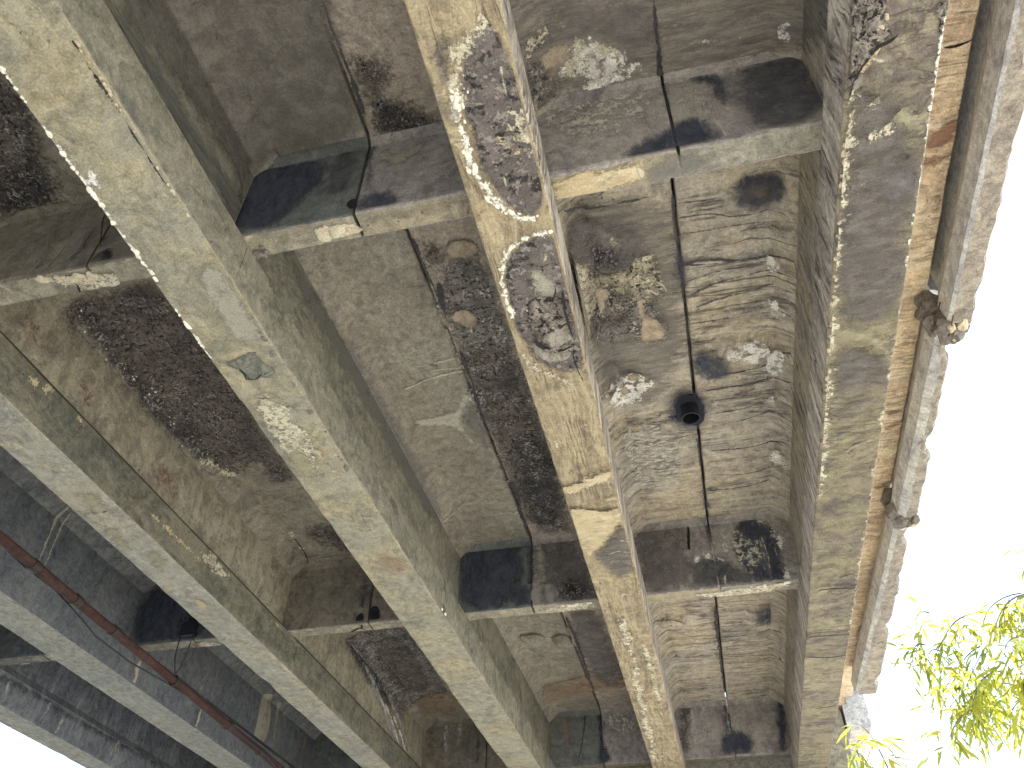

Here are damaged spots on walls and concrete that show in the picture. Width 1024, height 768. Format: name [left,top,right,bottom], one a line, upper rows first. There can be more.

spalling [0,92,43,186]
spalling [72,40,175,196]
water stain [690,57,833,132]
water stain [435,2,804,385]
spalling [226,317,276,380]
spalling [526,288,583,381]
peeling [595,287,610,314]
peeling [636,299,667,343]
spalling [914,290,971,345]
spalling [200,456,238,478]